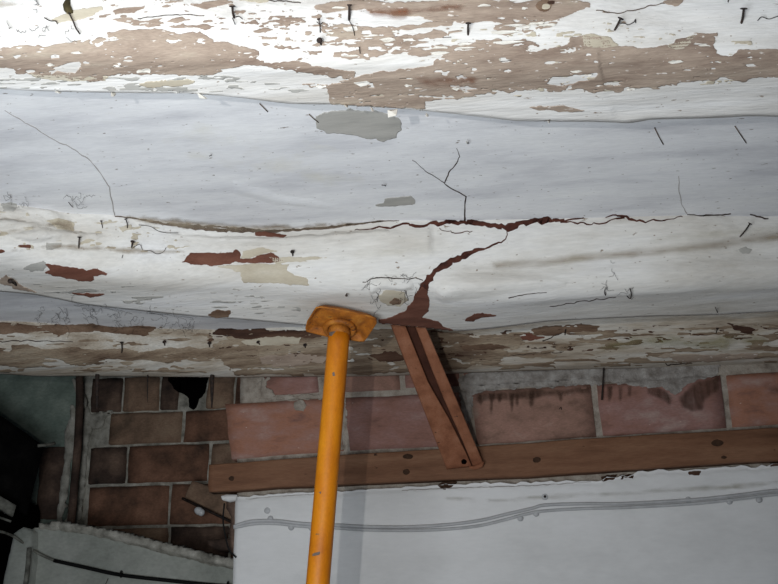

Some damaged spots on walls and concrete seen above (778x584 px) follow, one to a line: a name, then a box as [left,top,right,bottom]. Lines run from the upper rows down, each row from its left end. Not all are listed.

peeling [0,0,778,142]
crack [5,110,731,302]
peeling [47,218,157,252]
crack [0,337,73,345]
peeling [0,240,327,368]
flaking render [378,287,453,331]
peeling [465,313,496,322]
peeling [514,324,600,341]
crack [508,292,616,307]
peeling [727,323,755,334]
hole [168,377,209,410]
damp [458,365,720,424]